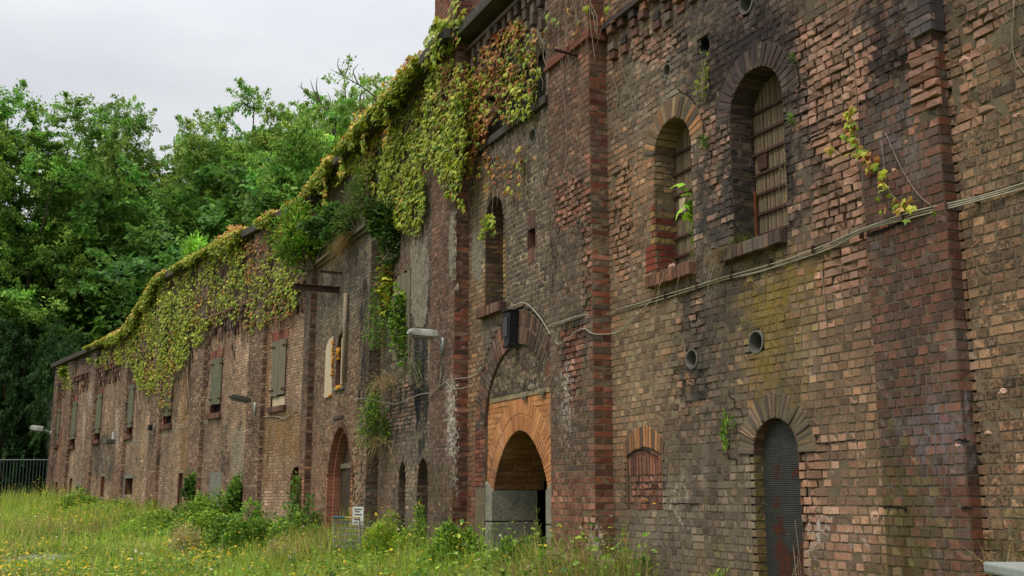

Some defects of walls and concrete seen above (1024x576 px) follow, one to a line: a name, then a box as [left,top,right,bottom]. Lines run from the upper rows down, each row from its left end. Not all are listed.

water stain [445,376,458,495]